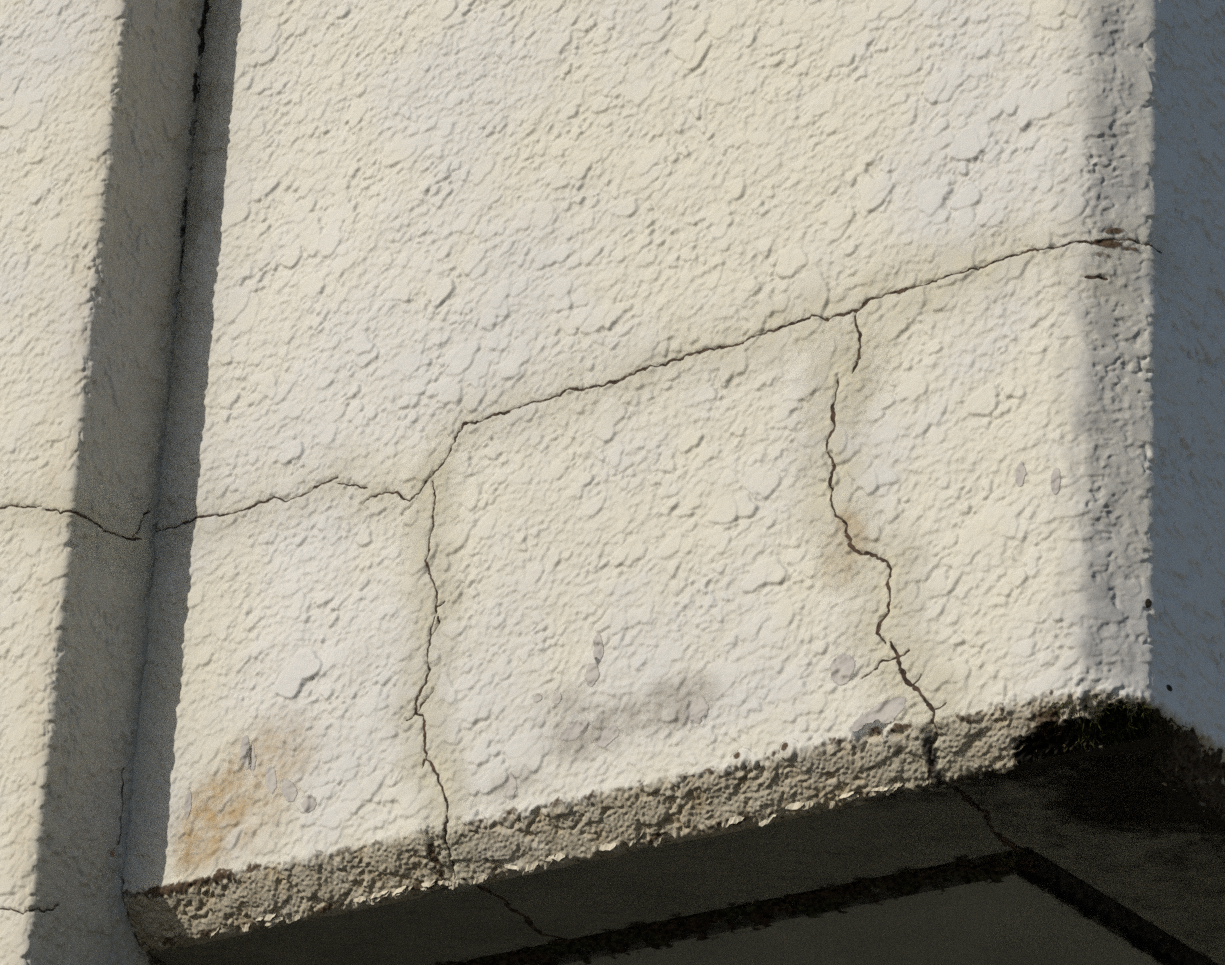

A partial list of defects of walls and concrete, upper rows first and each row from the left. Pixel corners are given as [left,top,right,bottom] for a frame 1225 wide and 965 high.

crack [190,0,210,134]
crack [180,167,192,272]
crack [0,238,1162,940]
water stain [805,241,1225,852]
rust [182,777,252,864]